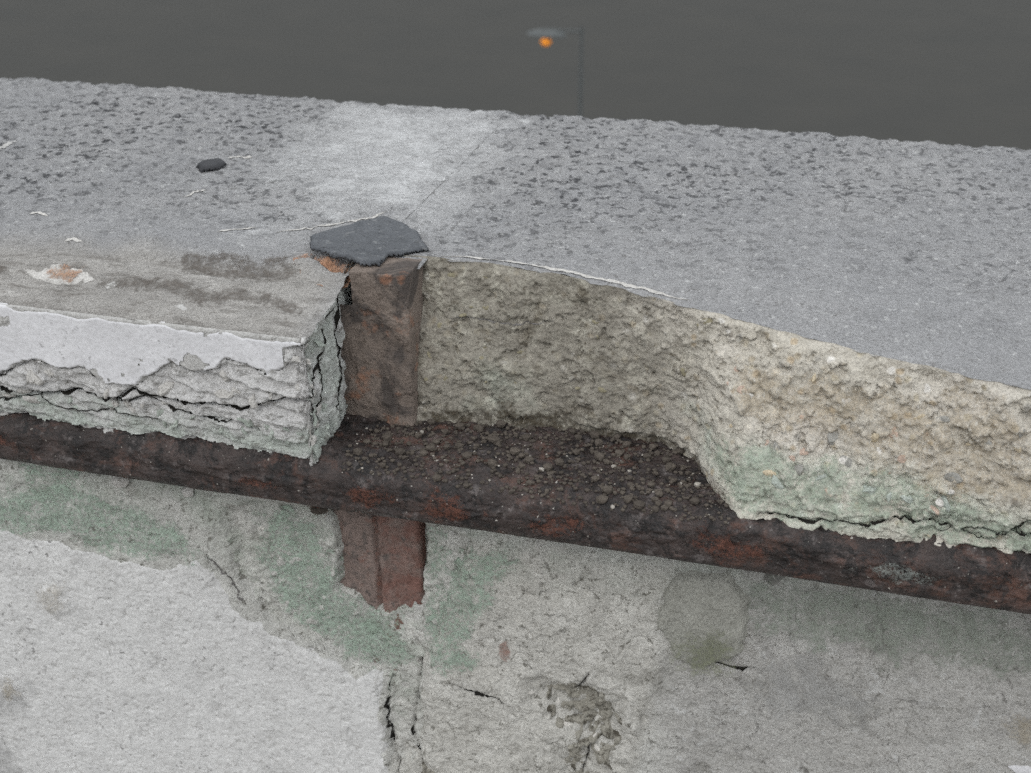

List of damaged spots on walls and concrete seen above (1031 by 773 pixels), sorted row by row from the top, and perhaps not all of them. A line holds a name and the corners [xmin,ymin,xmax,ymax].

crack [0,287,343,430]
spalling [0,261,354,464]
spalling [403,255,1031,554]
crack [760,511,1031,539]